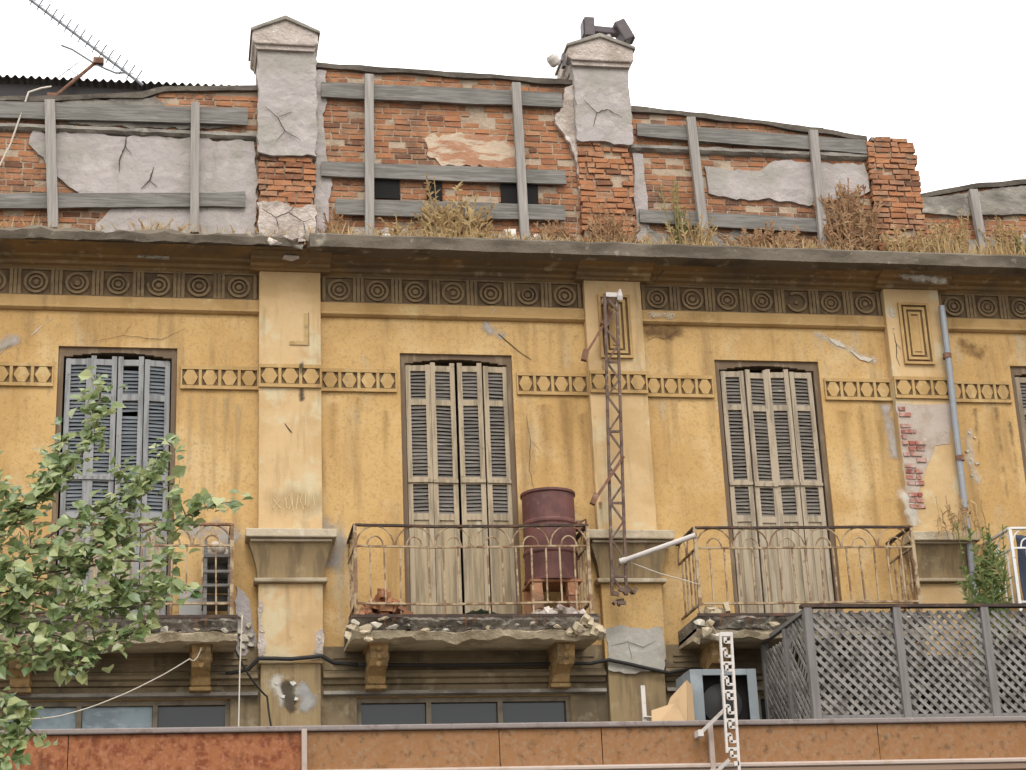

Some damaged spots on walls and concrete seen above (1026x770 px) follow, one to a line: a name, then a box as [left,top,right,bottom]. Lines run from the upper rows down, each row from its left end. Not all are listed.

peeling [817,334,876,362]
spalling [882,402,951,525]
flaking render [605,625,665,674]